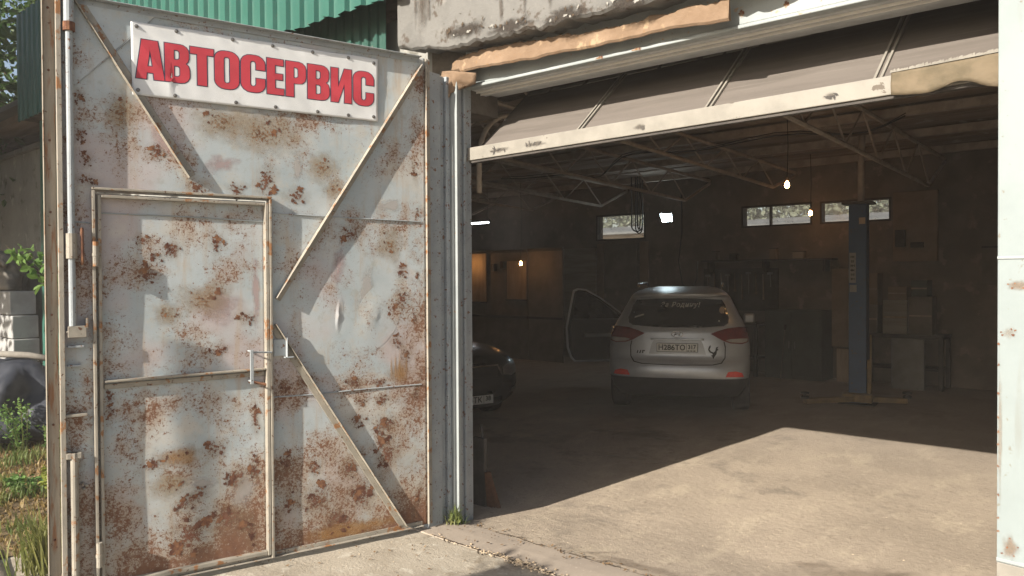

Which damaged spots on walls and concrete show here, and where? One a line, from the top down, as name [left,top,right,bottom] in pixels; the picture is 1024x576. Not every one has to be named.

spalling [545,4,582,24]
spalling [606,0,642,10]
spalling [446,16,526,37]
rust [321,522,379,539]